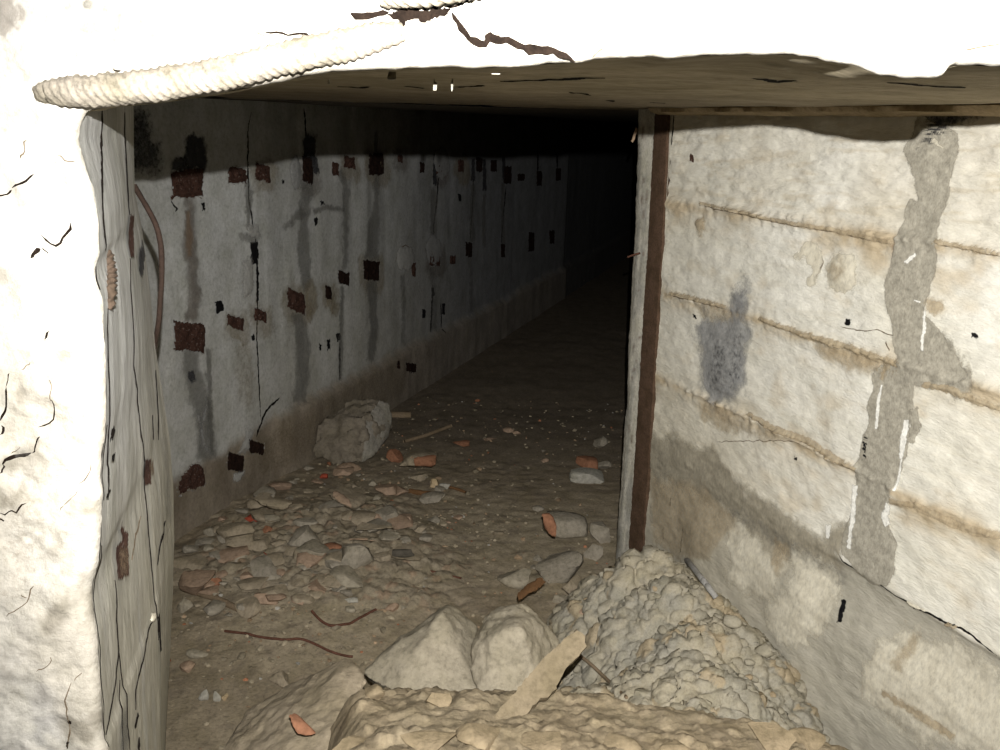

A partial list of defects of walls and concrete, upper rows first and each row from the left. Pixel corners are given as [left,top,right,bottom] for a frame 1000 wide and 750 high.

crack [350,0,615,106]
crack [0,140,34,197]
crack [30,223,72,258]
crack [247,115,279,437]
damp [943,335,972,398]
crack [0,363,55,473]
crack [60,111,166,750]
rust [144,459,154,486]
crack [0,503,26,521]
rust [116,525,129,580]
crack [880,585,997,656]